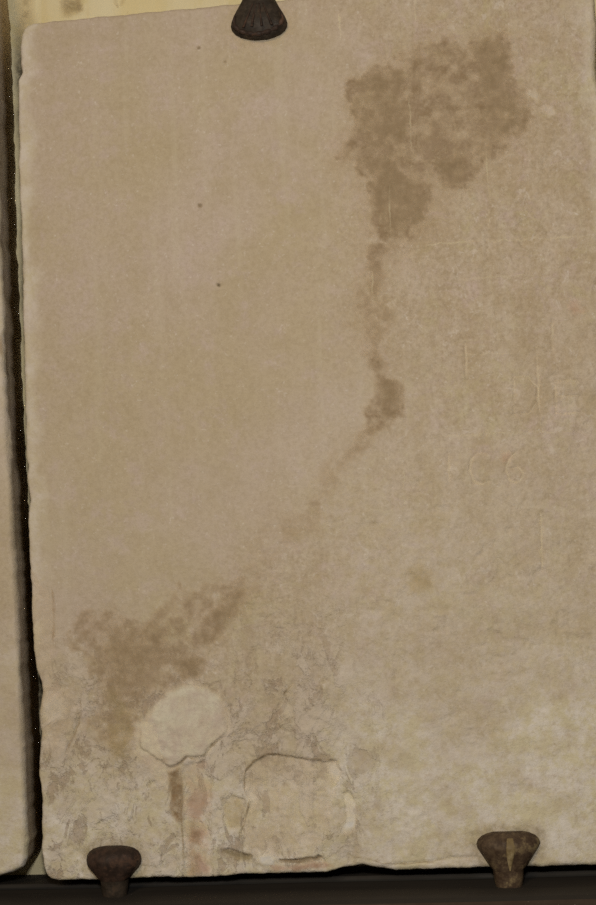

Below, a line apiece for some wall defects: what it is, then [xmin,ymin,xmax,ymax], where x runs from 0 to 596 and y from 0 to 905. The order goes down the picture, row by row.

damp [346,36,530,294]
damp [364,358,403,433]